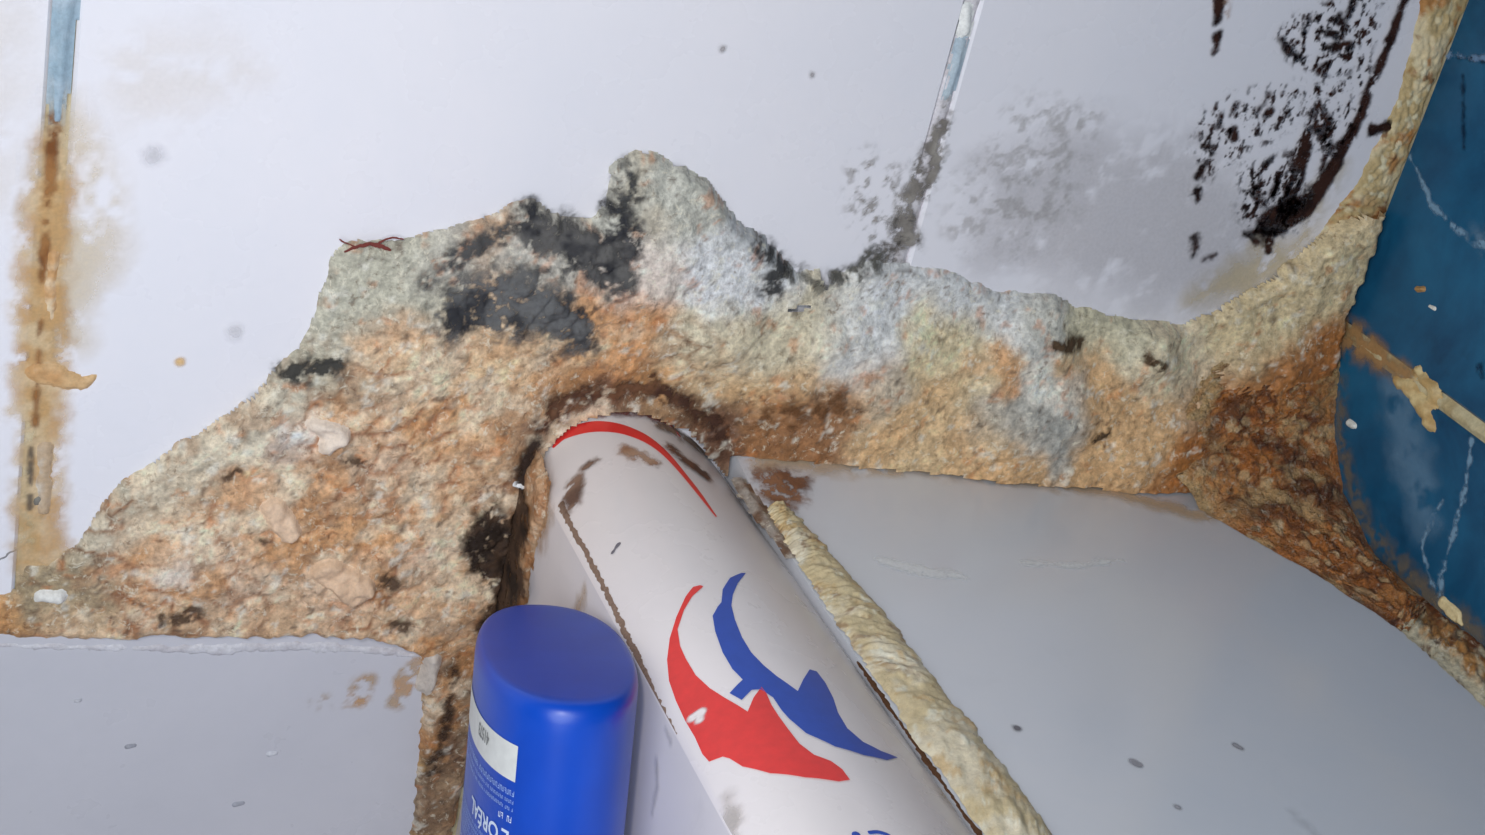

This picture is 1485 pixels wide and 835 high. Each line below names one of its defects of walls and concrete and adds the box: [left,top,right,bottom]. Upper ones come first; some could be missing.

rust [11,115,100,573]
water stain [423,161,645,357]
water stain [753,107,950,296]
water stain [1190,0,1409,296]
spalling [11,325,672,696]
water stain [427,666,459,776]
water stain [462,373,734,633]
peeling [1438,596,1463,626]